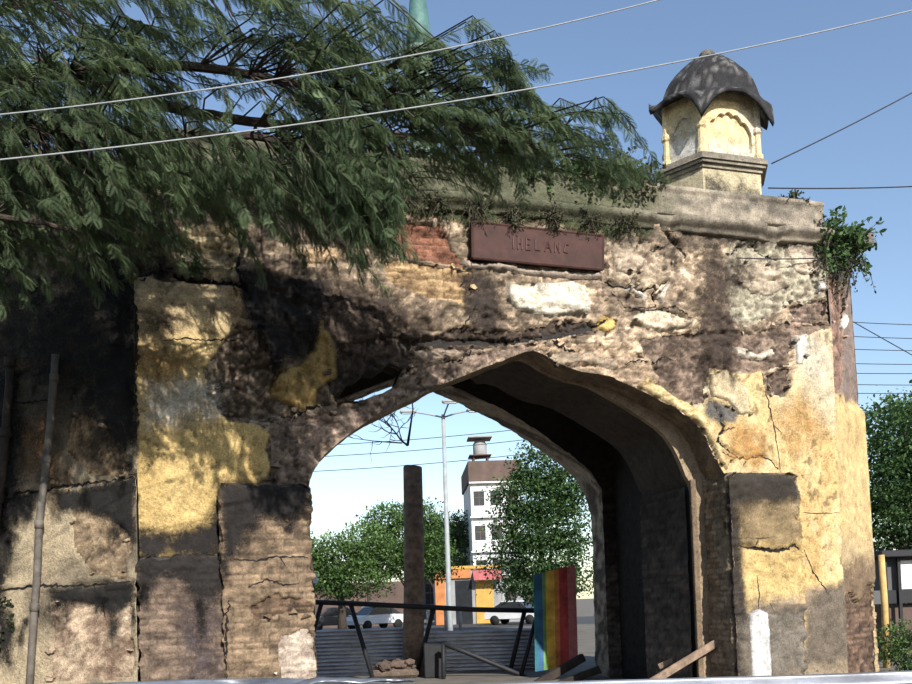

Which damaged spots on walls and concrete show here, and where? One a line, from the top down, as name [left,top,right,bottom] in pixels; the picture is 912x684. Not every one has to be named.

crack [2,581,131,618]
crack [18,476,134,494]
damp [0,196,350,680]
crack [132,241,251,428]
spalling [251,594,317,679]
spalling [204,236,849,484]
damp [605,227,851,386]
crack [710,375,782,472]
damp [722,472,802,676]
crack [738,537,827,591]